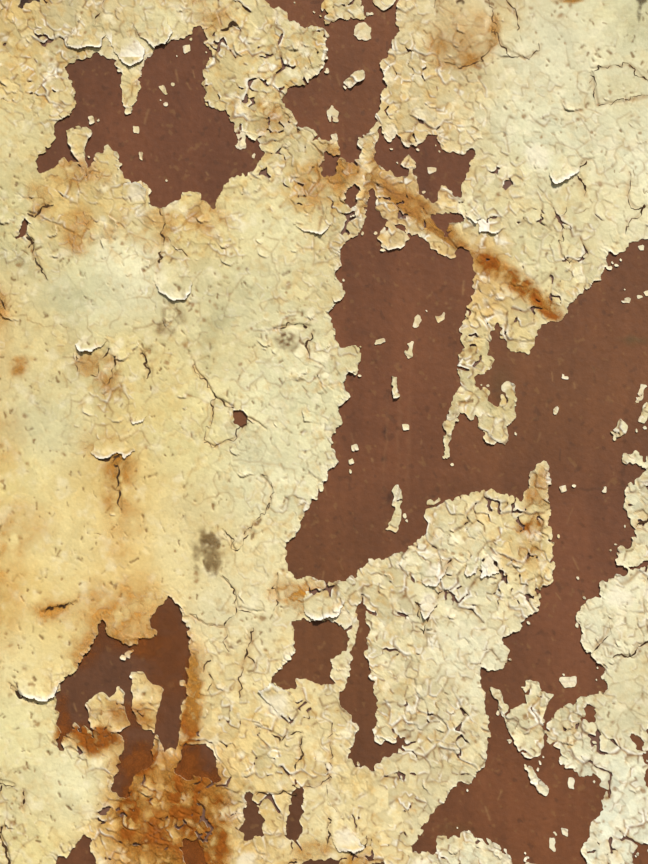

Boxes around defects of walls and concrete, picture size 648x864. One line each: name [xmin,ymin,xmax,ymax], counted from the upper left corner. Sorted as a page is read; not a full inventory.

crack [445,0,540,69]
peeling [34,10,267,215]
rust [309,154,562,321]
crack [193,364,264,448]
peeling [256,0,648,864]
rust [56,705,152,756]
peeling [14,590,225,798]
rust [91,602,151,652]
rust [115,659,230,864]
crack [257,723,336,844]
crack [594,625,648,658]
peeling [52,831,98,864]